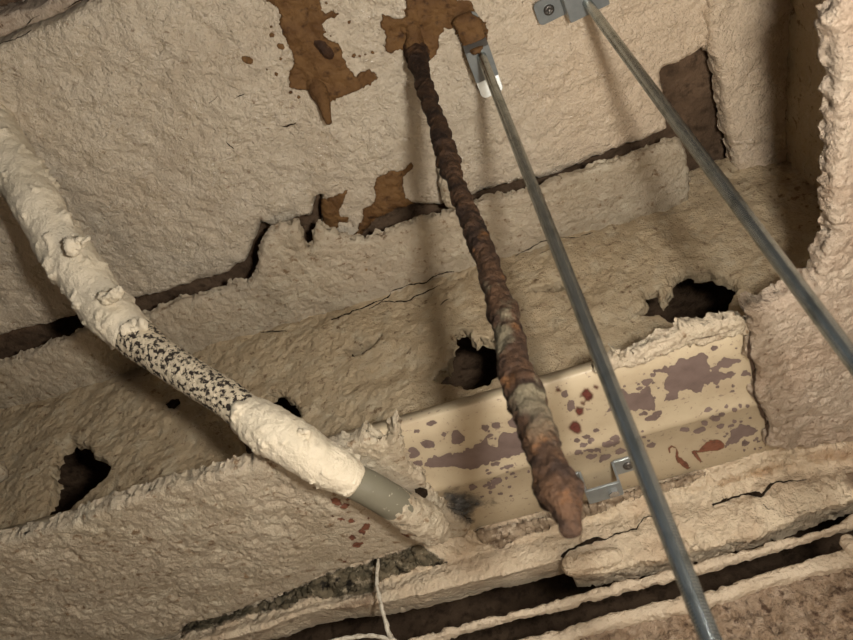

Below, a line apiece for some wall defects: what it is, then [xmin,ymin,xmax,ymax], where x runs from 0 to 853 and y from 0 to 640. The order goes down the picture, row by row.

rust [380,0,488,60]
rust [266,0,378,125]
rust [321,190,349,228]
rust [354,163,413,235]
crack [515,232,593,256]
crack [331,271,454,320]
peeling [622,346,751,448]
peeling [680,404,762,452]
peeling [408,418,527,498]
crack [712,479,807,510]
spalling [475,514,558,549]
crack [561,516,652,558]